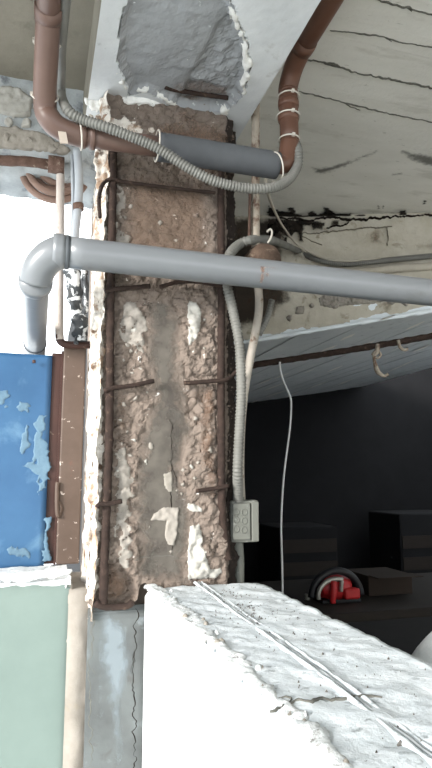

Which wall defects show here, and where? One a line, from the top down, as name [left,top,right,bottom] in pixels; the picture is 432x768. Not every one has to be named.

peeling [0,86,71,156]
spalling [84,0,253,144]
crack [299,91,432,123]
crack [308,59,432,89]
crack [330,30,432,48]
crack [378,0,432,16]
spalling [92,149,237,254]
crack [276,213,432,246]
peeling [0,390,31,413]
peeling [20,415,51,495]
spalling [81,271,432,768]
crack [130,608,139,768]